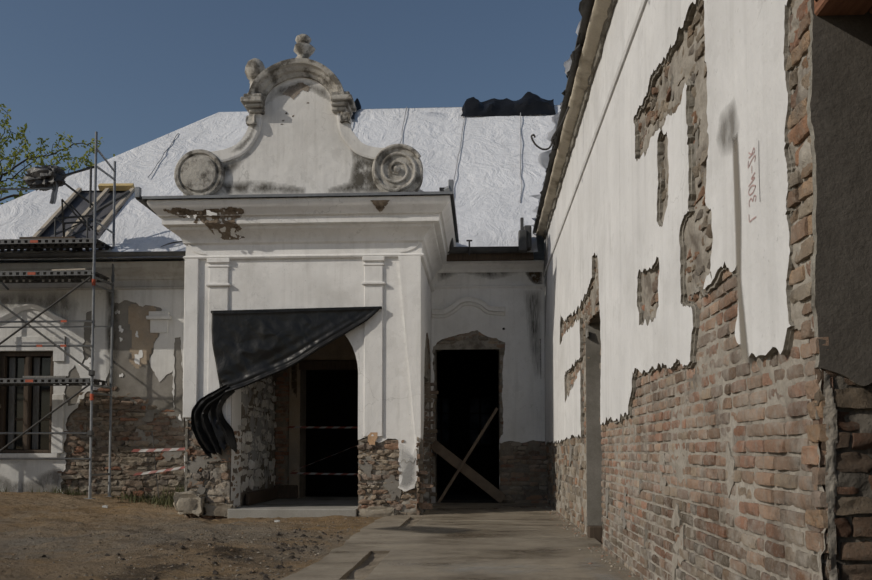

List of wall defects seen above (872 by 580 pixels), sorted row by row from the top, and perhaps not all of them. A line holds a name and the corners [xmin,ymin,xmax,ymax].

flaking render [57,300,277,519]
spalling [163,207,245,240]
spalling [371,200,390,211]
flaking render [357,255,601,535]
flaking render [599,0,872,580]